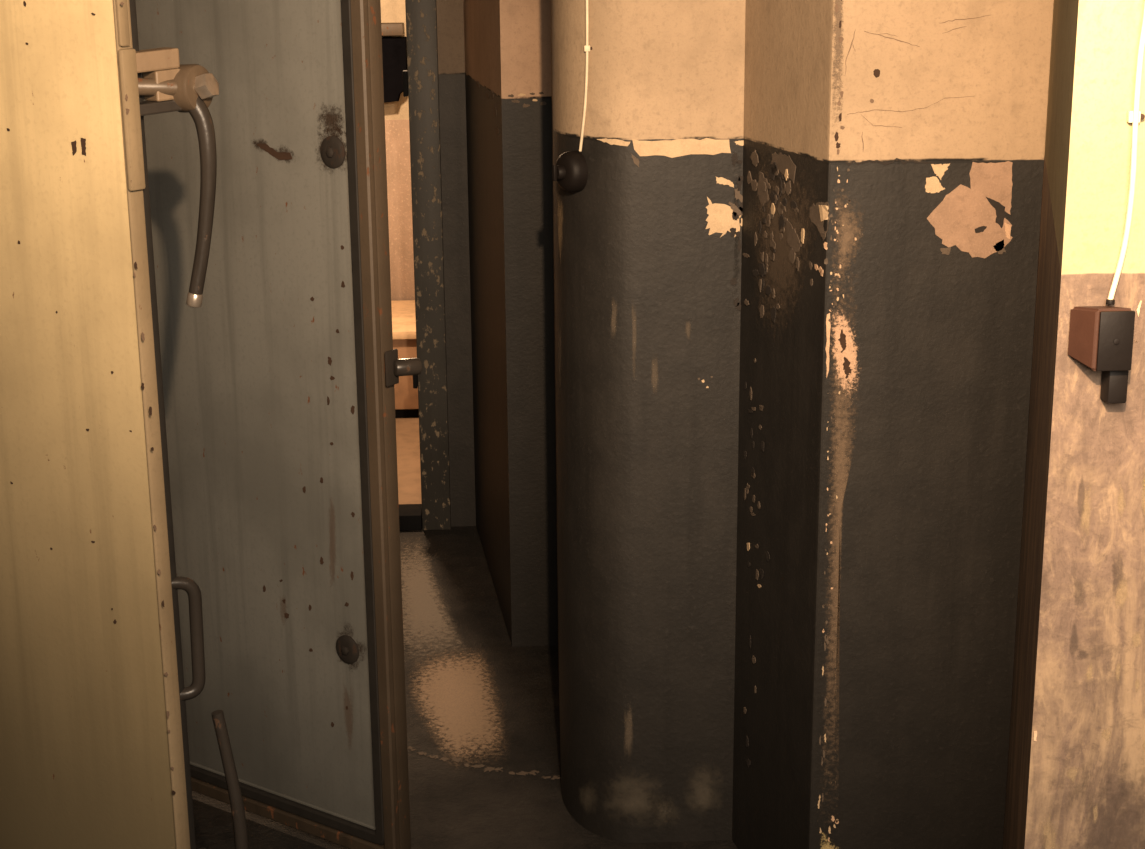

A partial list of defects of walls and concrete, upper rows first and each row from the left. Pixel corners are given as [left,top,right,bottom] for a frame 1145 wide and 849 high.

peeling [925,161,1013,258]
peeling [597,0,860,774]
spalling [819,816,839,849]